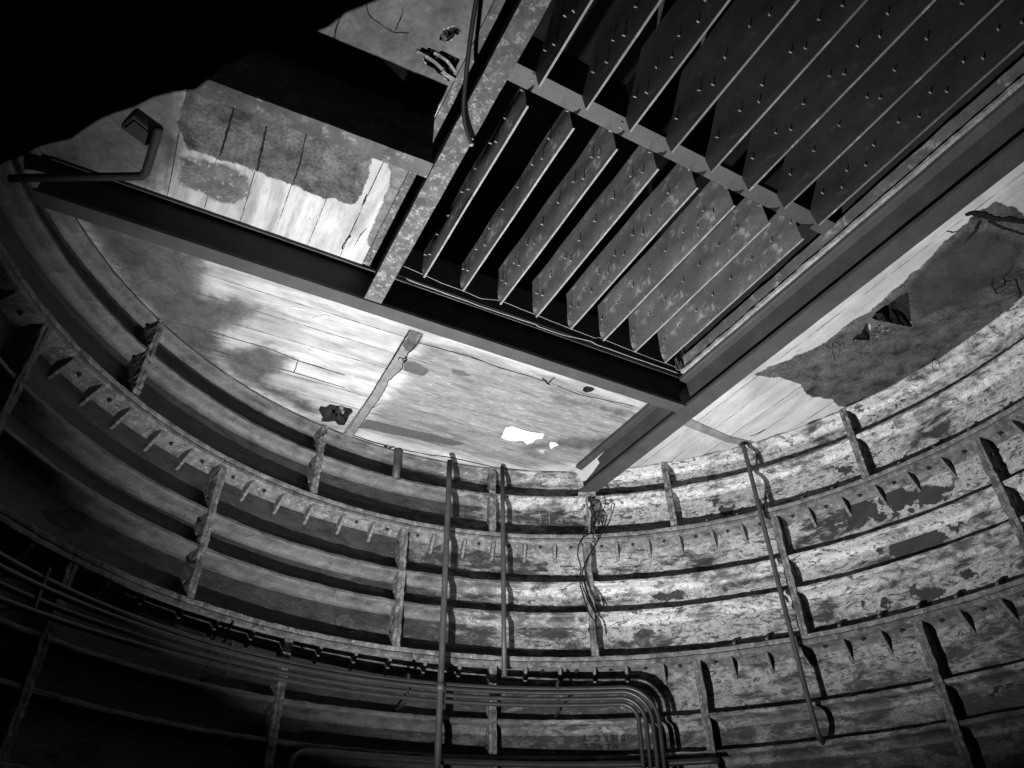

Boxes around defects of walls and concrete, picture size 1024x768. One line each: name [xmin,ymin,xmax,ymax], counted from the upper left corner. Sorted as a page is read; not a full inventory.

spalling [416,27,460,82]
crack [219,108,235,157]
crack [256,126,267,172]
crack [293,134,307,184]
crack [342,194,367,249]
spalling [852,292,912,341]
spalling [319,404,353,425]
peeling [501,426,558,453]